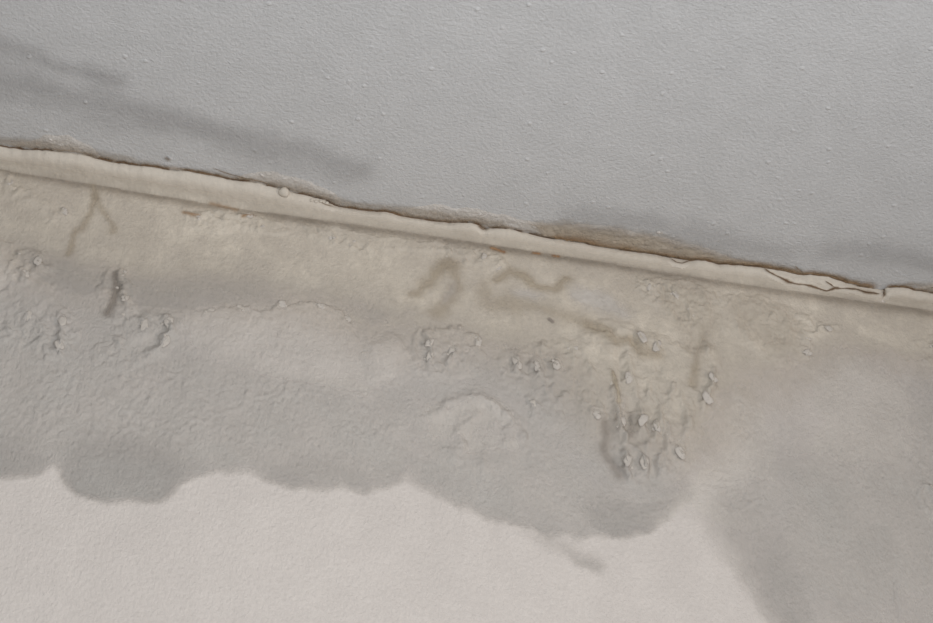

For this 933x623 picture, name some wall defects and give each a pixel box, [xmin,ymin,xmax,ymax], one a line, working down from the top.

crack [0,144,53,152]
crack [87,155,276,187]
water stain [0,160,933,377]
crack [297,193,933,297]
water stain [0,289,657,535]